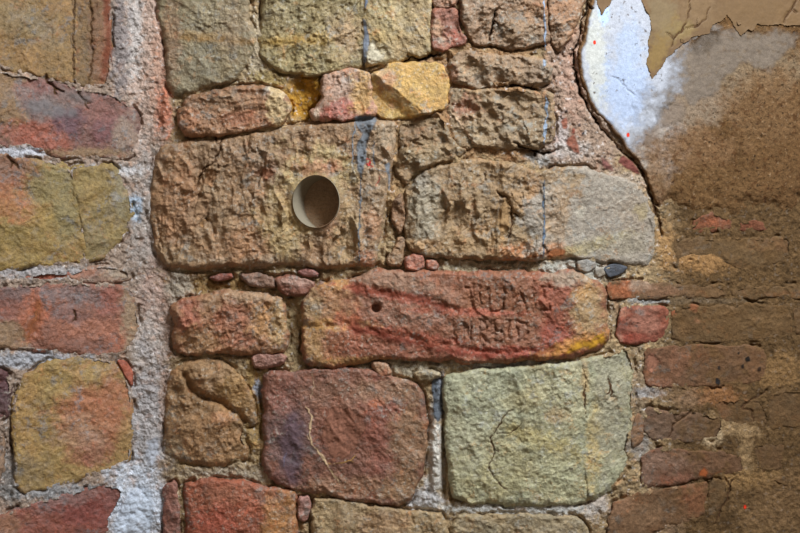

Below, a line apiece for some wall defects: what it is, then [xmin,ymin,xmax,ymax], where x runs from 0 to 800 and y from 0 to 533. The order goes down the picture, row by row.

peeling [582,0,800,148]
crack [488,410,521,490]